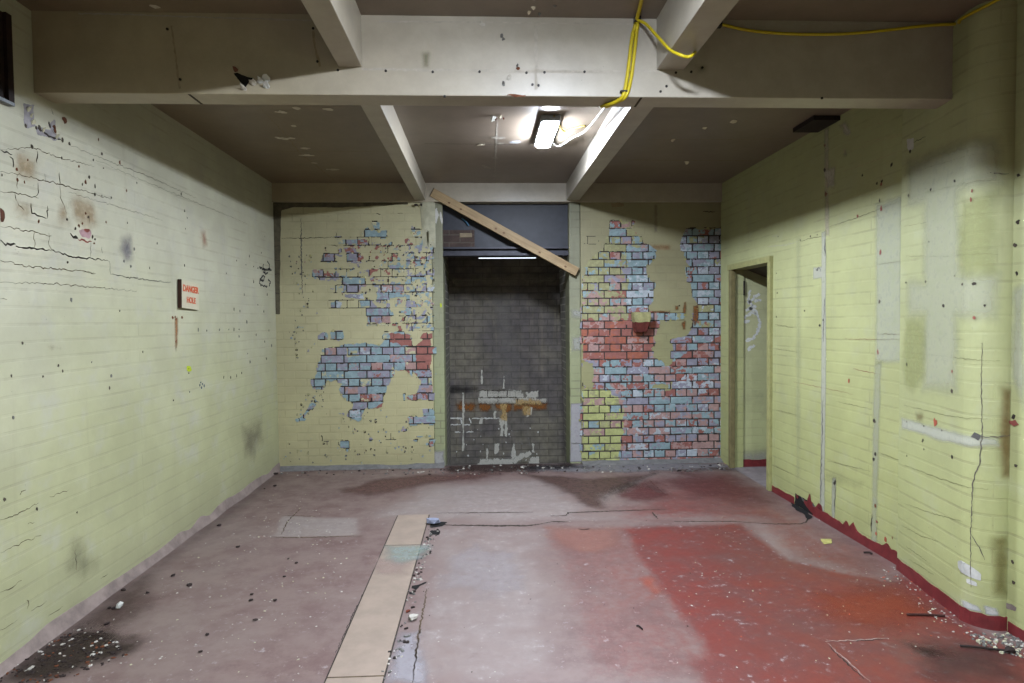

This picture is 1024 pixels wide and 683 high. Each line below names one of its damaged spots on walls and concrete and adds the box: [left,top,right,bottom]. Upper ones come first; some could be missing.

peeling [16,103,71,183]
crack [0,109,247,300]
peeling [284,221,437,464]
peeling [478,389,547,405]
peeling [578,219,721,460]
crack [445,369,877,530]
crack [849,333,1010,576]